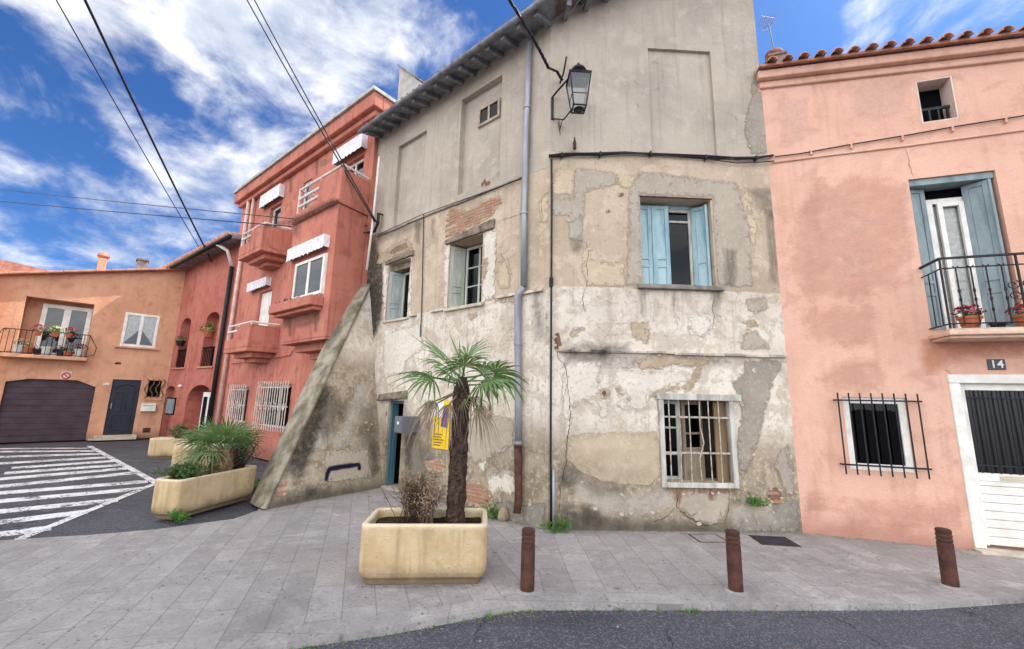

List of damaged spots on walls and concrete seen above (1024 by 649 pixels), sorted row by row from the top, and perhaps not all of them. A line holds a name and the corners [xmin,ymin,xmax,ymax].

flaking render [445,179,502,238]
flaking render [538,168,576,222]
flaking render [581,243,625,287]
flaking render [561,321,719,436]
water stain [290,387,330,471]
crack [556,342,571,507]
flaking render [423,459,446,473]
flaking render [465,452,515,513]
crack [658,493,730,526]
flaking render [766,446,795,524]